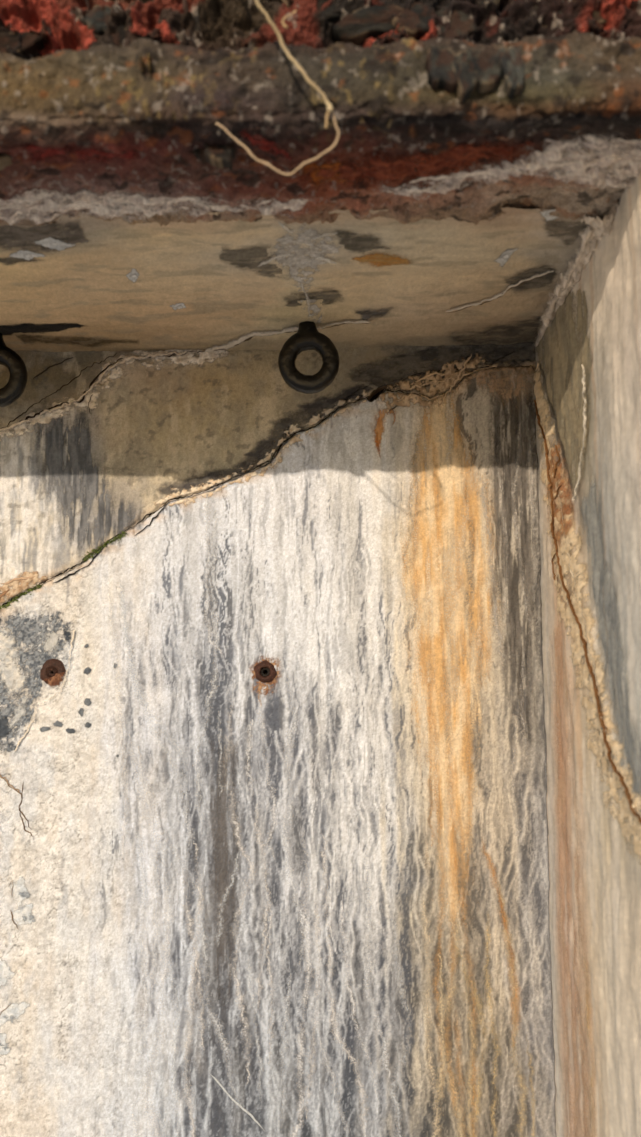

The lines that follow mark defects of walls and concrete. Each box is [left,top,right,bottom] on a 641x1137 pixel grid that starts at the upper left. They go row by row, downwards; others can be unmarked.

peeling [0,0,177,57]
peeling [579,0,637,37]
peeling [189,142,236,171]
crack [0,352,536,606]
rust [374,409,395,456]
rust [44,672,65,686]
rust [403,393,491,920]
water stain [480,385,541,788]
crack [534,400,641,823]
crack [3,778,33,837]
water stain [131,664,374,1137]
water stain [426,956,491,1137]